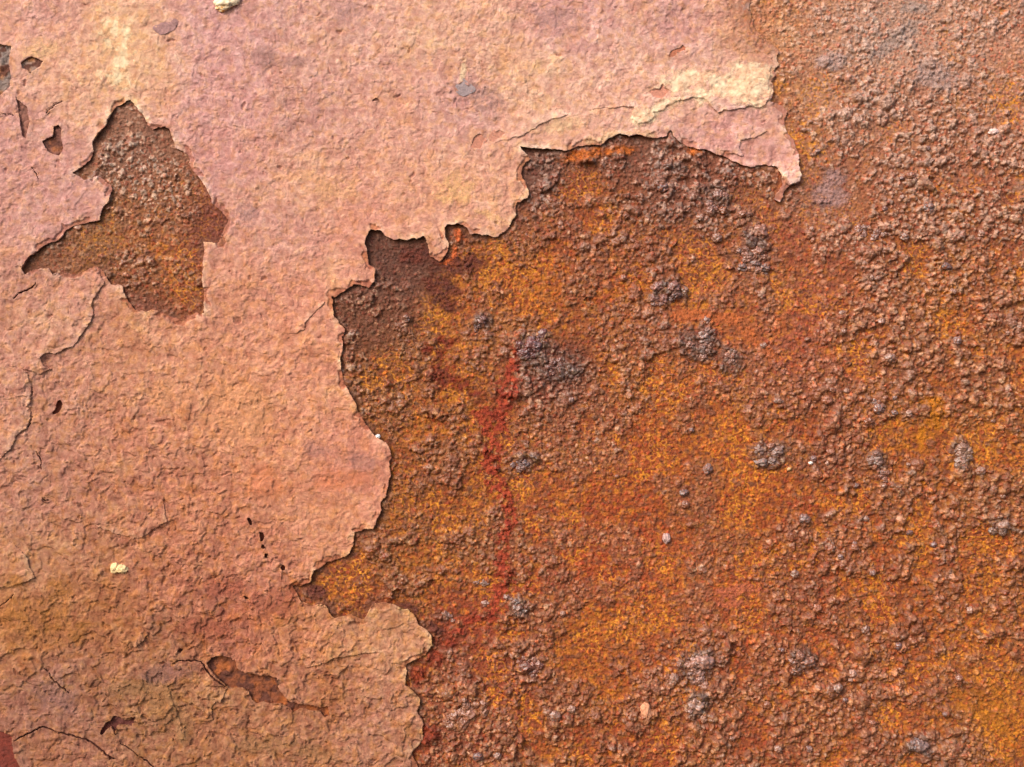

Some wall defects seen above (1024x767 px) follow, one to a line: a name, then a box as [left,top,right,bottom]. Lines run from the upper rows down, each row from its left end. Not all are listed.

peeling [0,44,43,95]
rust [566,146,634,161]
rust [813,170,846,205]
peeling [0,100,228,460]
rust [400,229,483,311]
peeling [282,0,1024,767]
rust [410,336,523,684]
peeling [190,653,329,722]
rust [422,725,440,745]